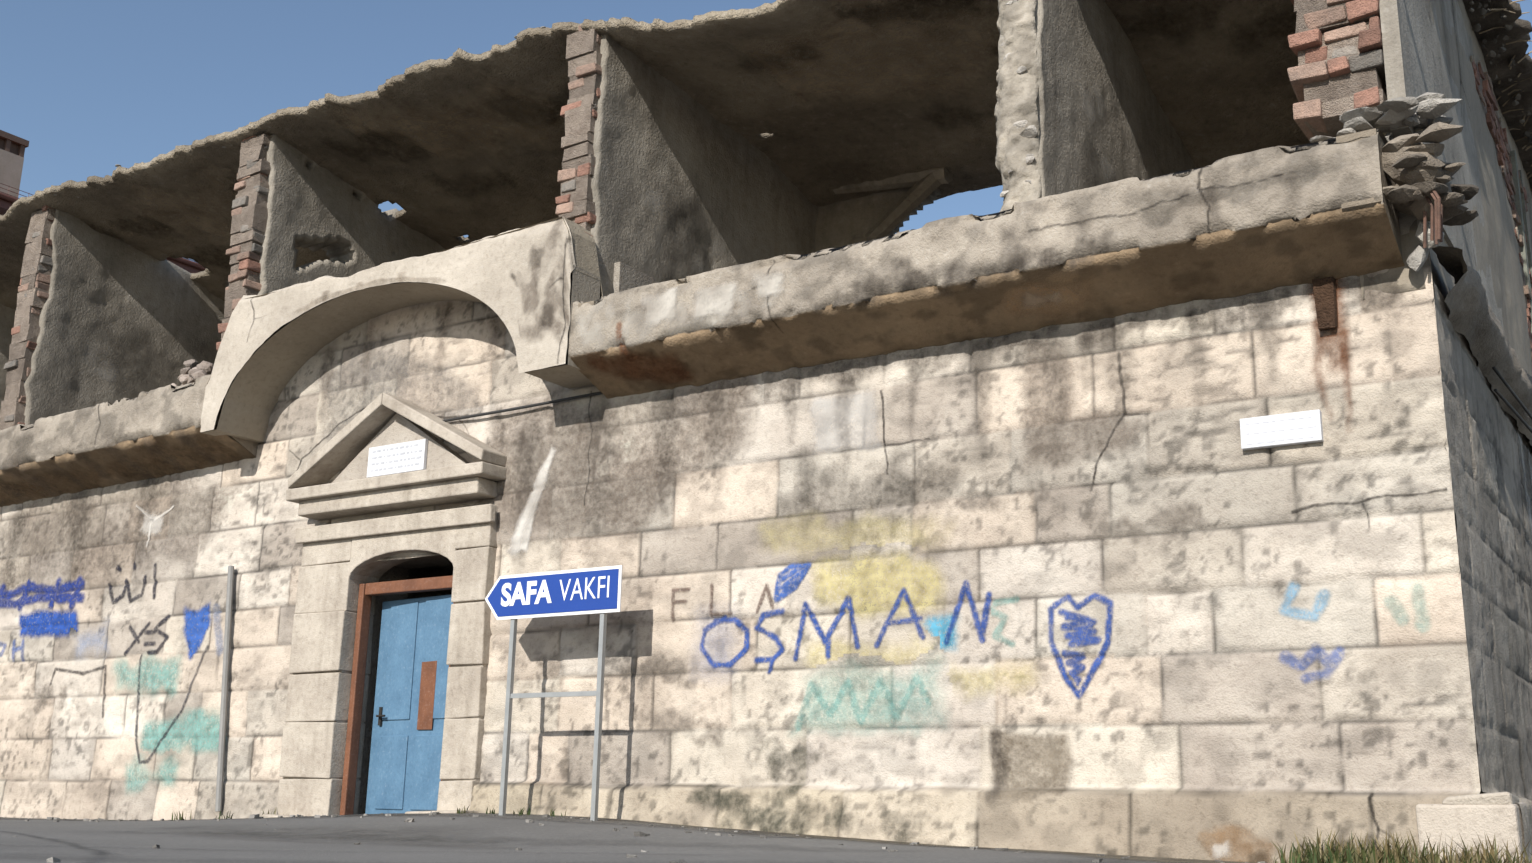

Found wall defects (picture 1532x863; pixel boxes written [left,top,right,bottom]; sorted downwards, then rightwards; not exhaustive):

flaking render [0,205,55,430]
flaking render [171,134,272,386]
flaking render [511,25,781,347]
flaking render [1287,0,1532,357]